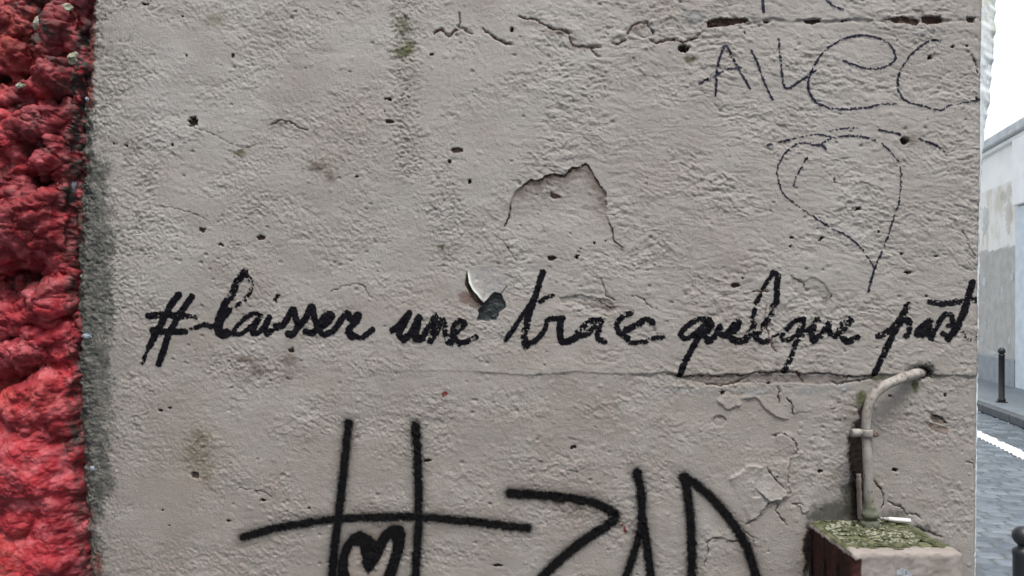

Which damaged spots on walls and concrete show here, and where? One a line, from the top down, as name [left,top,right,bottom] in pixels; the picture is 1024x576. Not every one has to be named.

crack [434,15,511,45]
crack [519,16,701,56]
spalling [707,18,748,34]
spalling [887,16,942,26]
peeling [504,163,607,225]
crack [668,290,871,562]